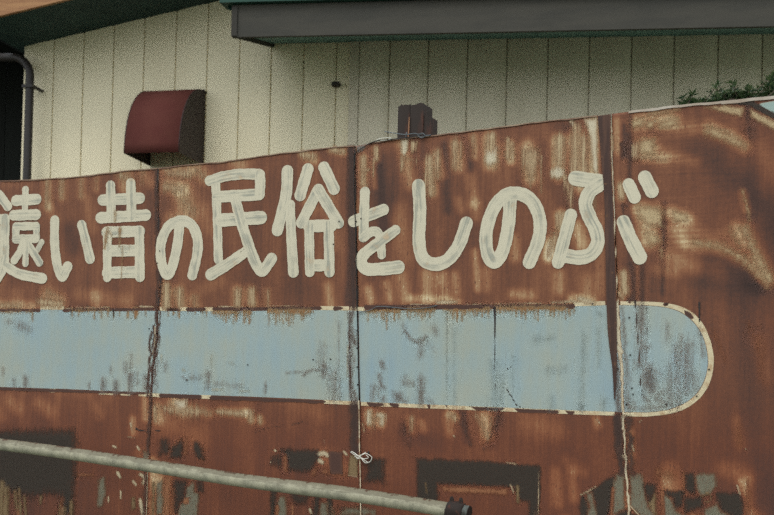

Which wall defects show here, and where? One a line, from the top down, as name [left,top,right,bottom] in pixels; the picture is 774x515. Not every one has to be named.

peeling [610,125,626,205]
corrosion [0,144,575,459]
peeling [311,450,359,478]
peeling [580,486,598,515]
corrosion [612,263,707,480]
peeling [610,266,730,515]